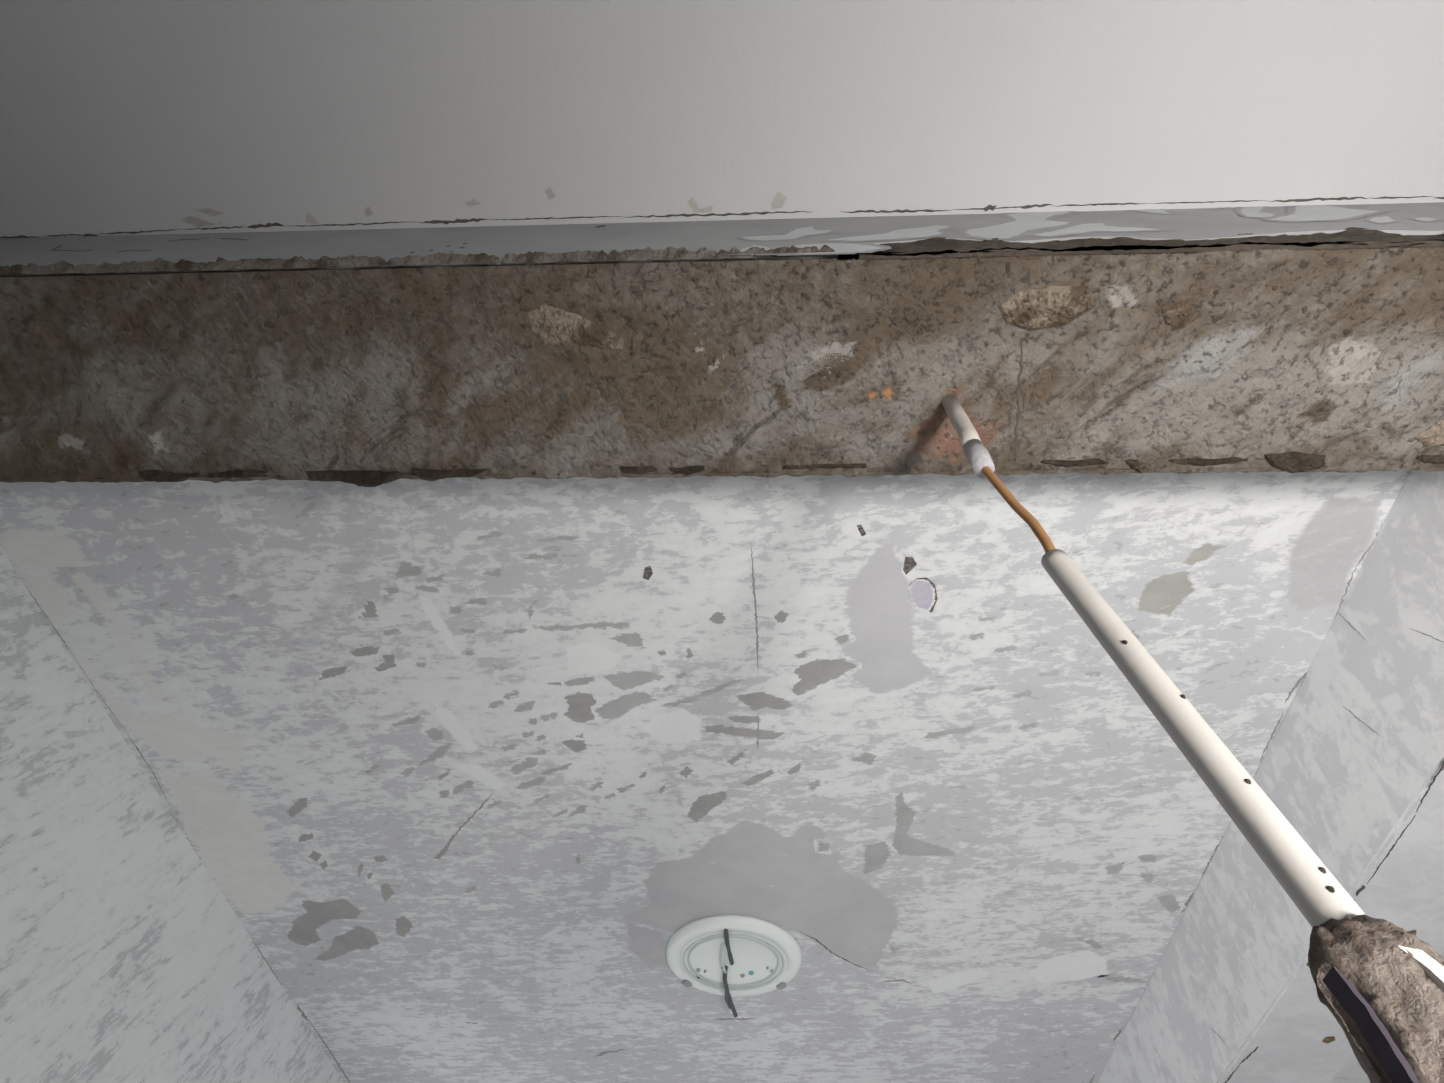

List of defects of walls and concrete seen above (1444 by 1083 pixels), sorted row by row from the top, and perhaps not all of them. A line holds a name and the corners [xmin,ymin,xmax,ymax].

flaking render [0,201,1444,275]
spalling [999,285,1097,331]
spalling [1160,299,1202,329]
spalling [306,468,487,487]
flaking render [520,532,585,564]
peeling [900,555,919,577]
flaking render [316,556,862,825]
flaking render [848,749,882,768]
flaking render [860,788,963,877]